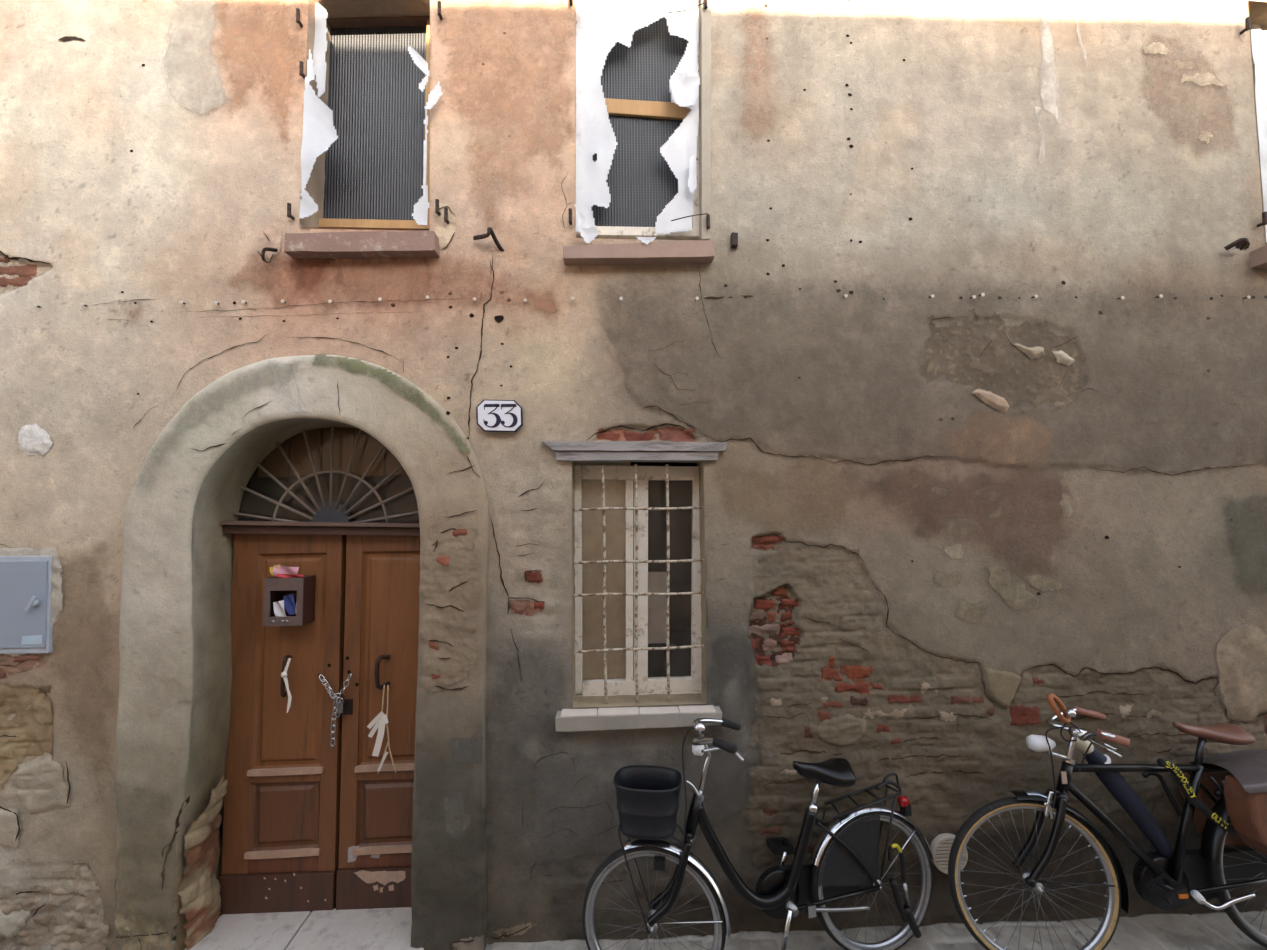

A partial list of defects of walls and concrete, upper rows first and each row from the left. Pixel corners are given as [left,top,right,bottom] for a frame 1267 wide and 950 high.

leakage [1039,0,1058,118]
spalling [0,251,52,295]
crack [194,401,271,451]
crack [177,299,449,388]
crack [448,253,494,477]
spalling [587,423,697,442]
crack [642,266,942,466]
spalling [919,296,1098,414]
crack [490,517,536,684]
spalling [0,655,53,791]
spalling [741,533,1267,869]
spalling [0,775,228,950]